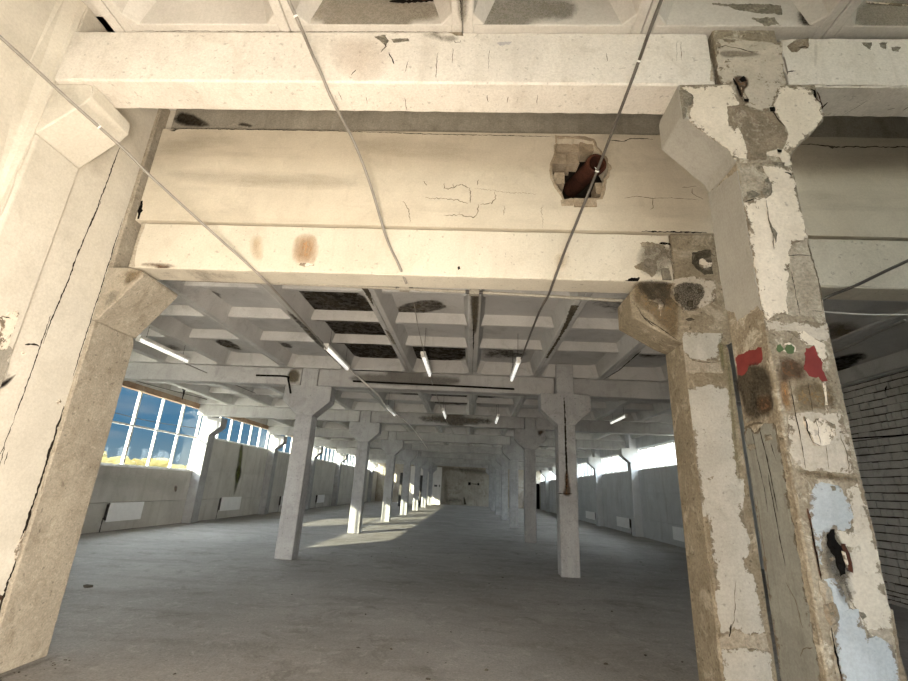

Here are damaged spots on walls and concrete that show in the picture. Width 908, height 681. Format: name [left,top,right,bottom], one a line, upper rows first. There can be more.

peeling [862,42,901,52]
crack [404,181,543,227]
spalling [549,135,612,207]
peeling [625,38,829,363]
rust [299,240,312,259]
crack [0,148,123,464]
peeling [0,311,19,387]
peeling [682,332,723,374]
damp [729,365,772,419]
crack [0,407,64,610]
peeling [688,384,774,681]
peeling [787,381,907,681]